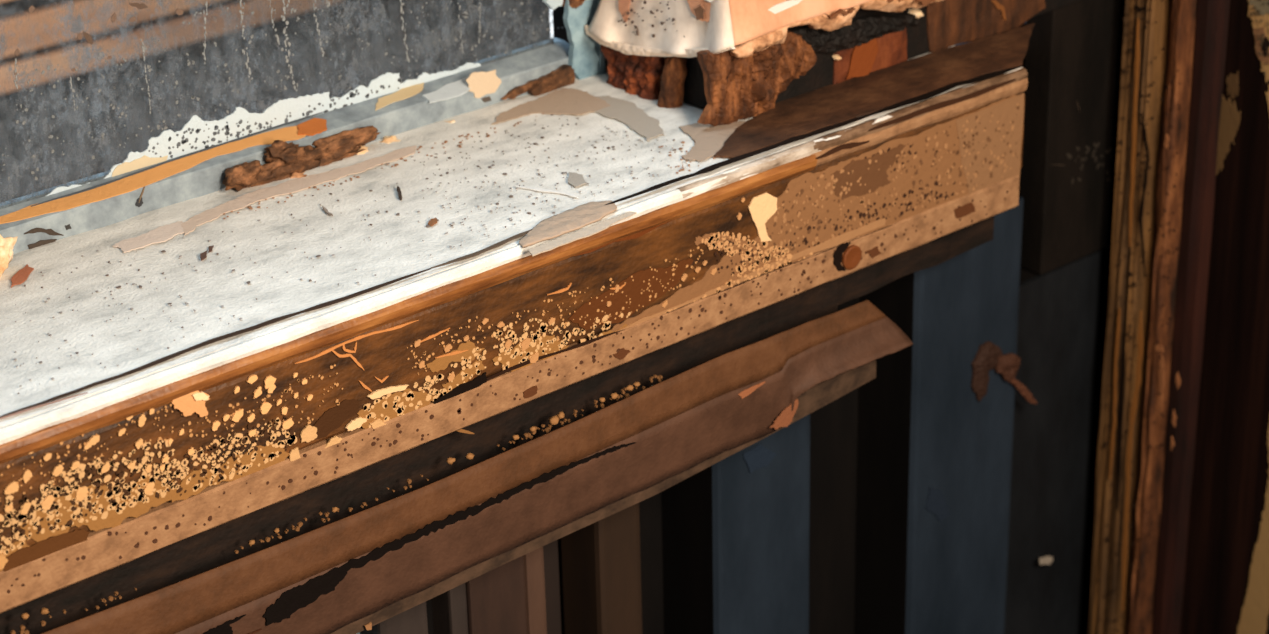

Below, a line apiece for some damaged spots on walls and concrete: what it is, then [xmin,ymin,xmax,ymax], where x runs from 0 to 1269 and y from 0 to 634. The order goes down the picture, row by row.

peeling [542,0,563,10]
spalling [728,0,944,58]
peeling [422,69,502,103]
peeling [1216,71,1241,175]
peeling [680,260,717,281]
corrosion [833,242,851,271]
peeling [367,384,409,399]
peeling [118,372,387,495]
peeling [769,399,799,430]
peeling [28,435,100,476]
peeling [4,469,55,515]
peeling [263,572,348,626]